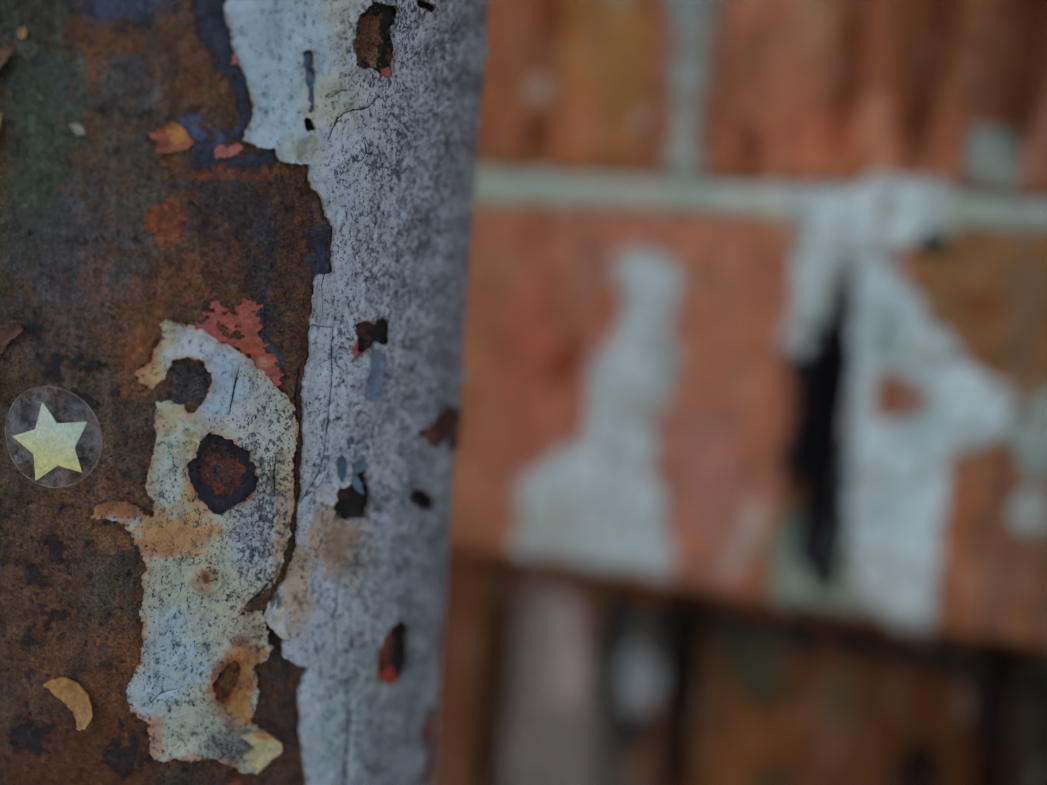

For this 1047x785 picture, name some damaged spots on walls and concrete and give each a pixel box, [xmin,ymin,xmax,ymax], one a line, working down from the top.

peeling [0,26,28,70]
peeling [90,0,489,785]